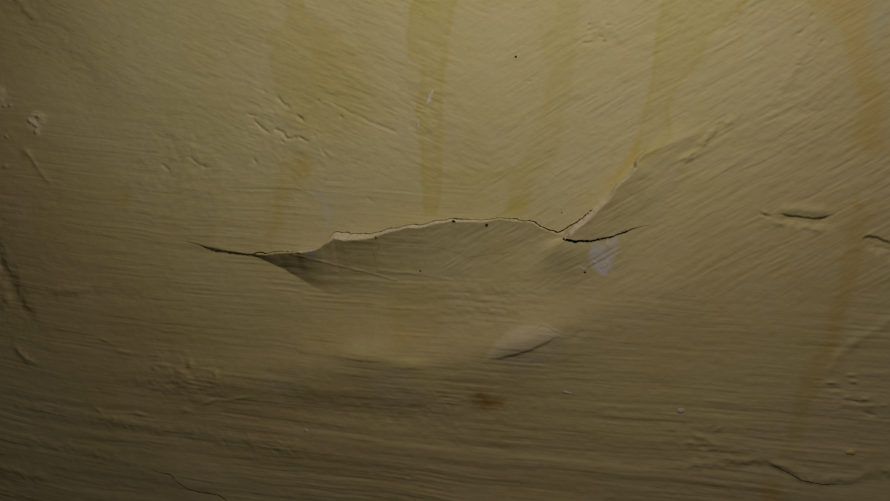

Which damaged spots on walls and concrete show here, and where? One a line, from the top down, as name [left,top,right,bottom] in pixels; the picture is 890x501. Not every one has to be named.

crack [179,155,655,272]
damp [404,0,583,221]